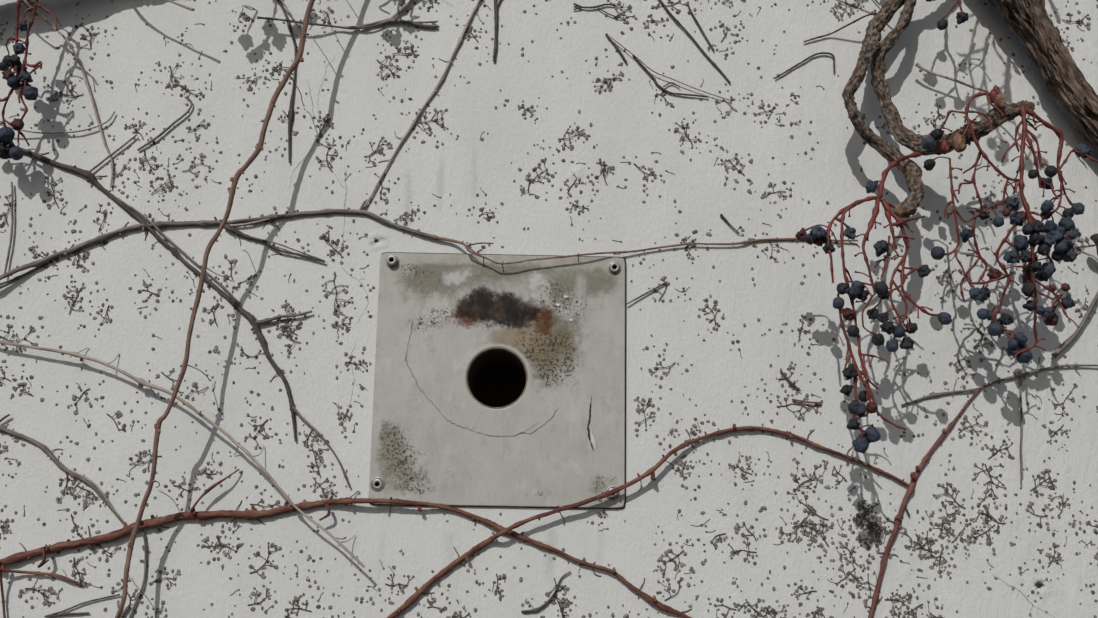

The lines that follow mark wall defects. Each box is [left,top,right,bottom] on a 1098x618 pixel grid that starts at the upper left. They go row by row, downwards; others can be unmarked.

corrosion [453,288,572,361]
crack [405,323,558,437]
mould [381,425,425,493]
crack [587,396,596,451]